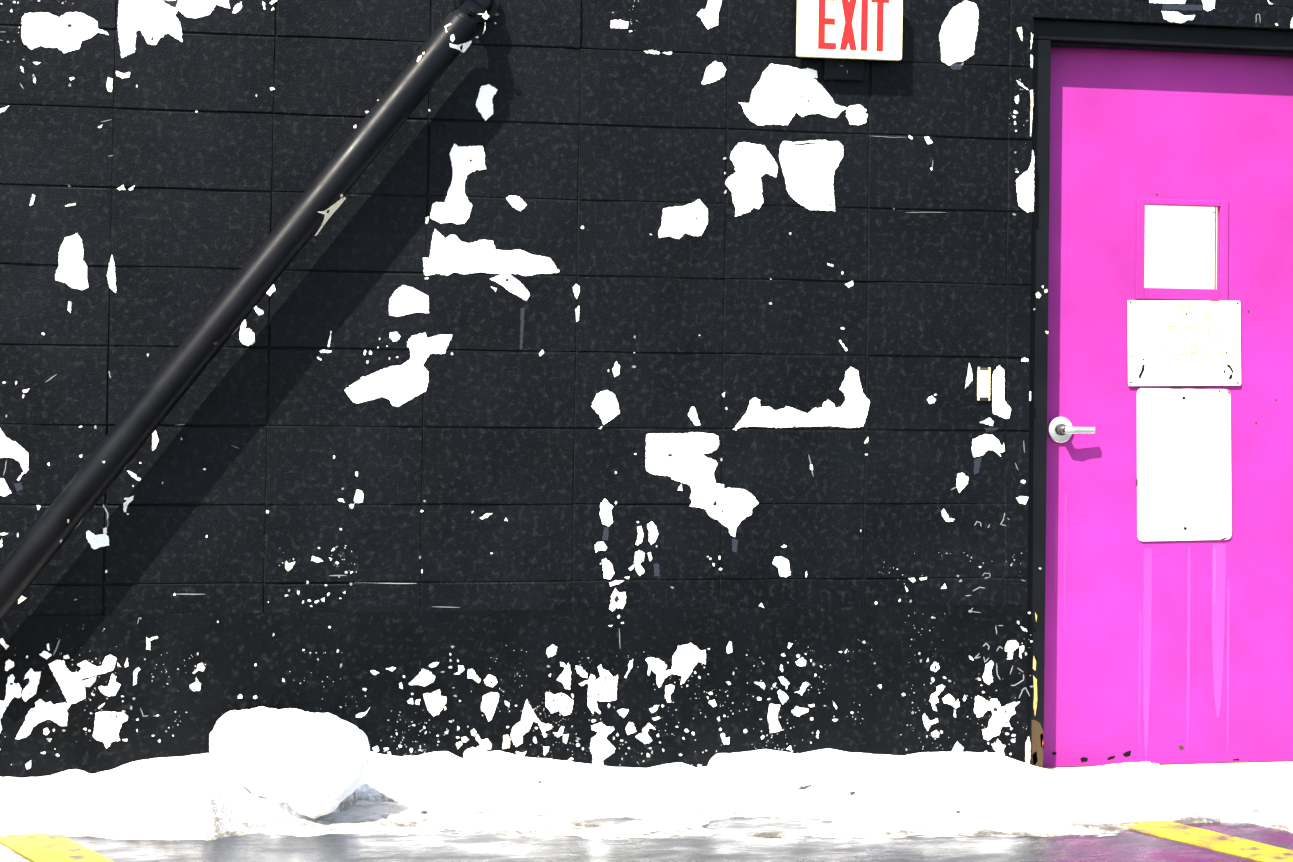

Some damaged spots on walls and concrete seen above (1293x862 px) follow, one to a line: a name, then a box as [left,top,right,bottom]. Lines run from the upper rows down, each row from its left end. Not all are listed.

peeling [20,0,242,92]
peeling [740,64,868,126]
peeling [939,0,979,65]
peeling [55,233,88,313]
peeling [423,144,557,300]
peeling [725,140,843,217]
peeling [344,285,452,407]
peeling [734,367,870,444]
peeling [646,407,758,537]
peeling [0,638,140,748]
peeling [455,643,706,766]
peeling [923,621,1027,756]